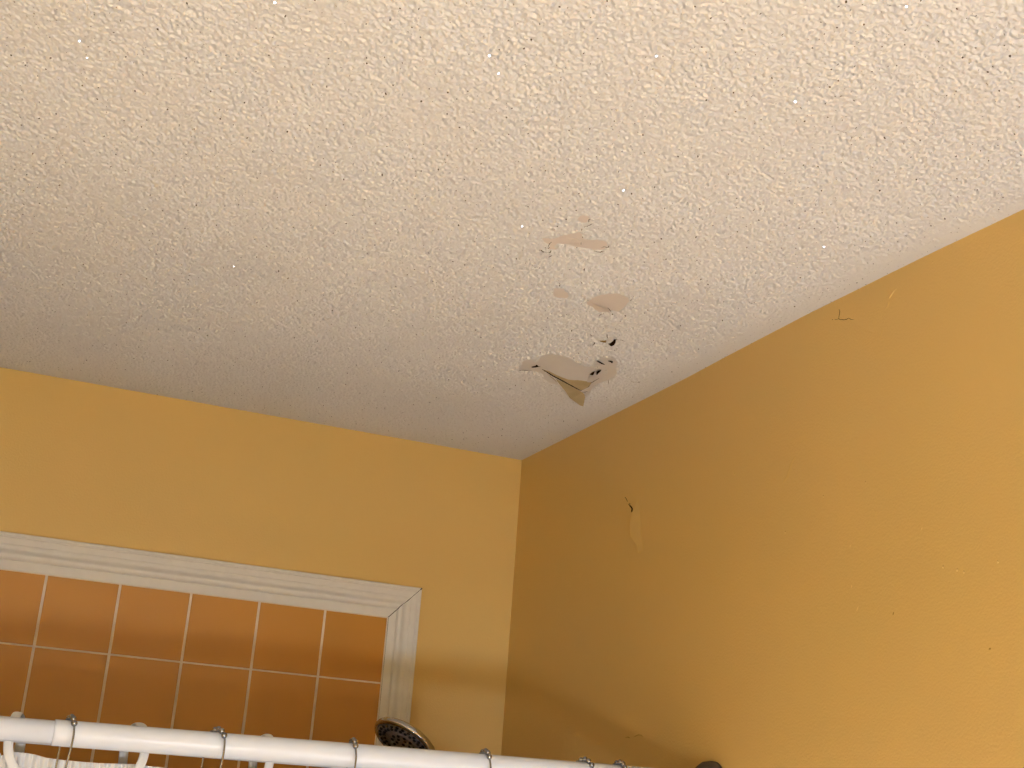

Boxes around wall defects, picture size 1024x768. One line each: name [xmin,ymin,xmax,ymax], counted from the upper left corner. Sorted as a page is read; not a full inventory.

peeling [539,215,609,257]
peeling [587,293,631,316]
peeling [519,354,617,406]